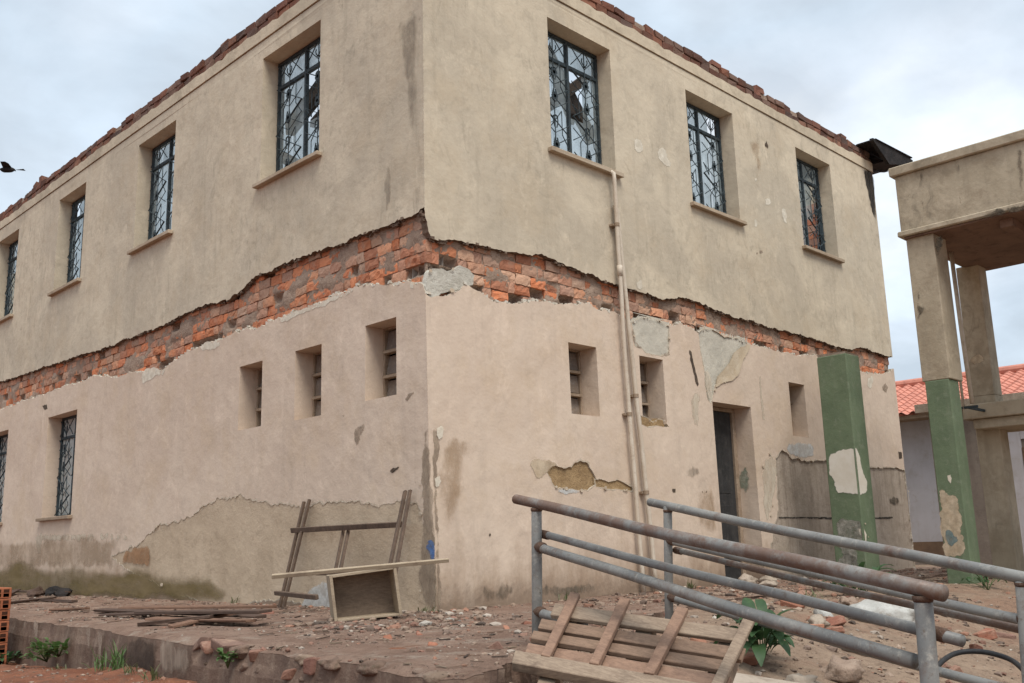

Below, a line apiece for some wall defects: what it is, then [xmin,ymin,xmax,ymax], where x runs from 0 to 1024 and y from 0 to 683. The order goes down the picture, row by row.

spalling [0,204,891,409]
crack [689,350,699,386]
flaking render [112,426,444,611]
flaking render [531,459,633,494]
flaking render [771,443,915,571]
flaking render [939,475,965,557]
water stain [0,538,223,600]